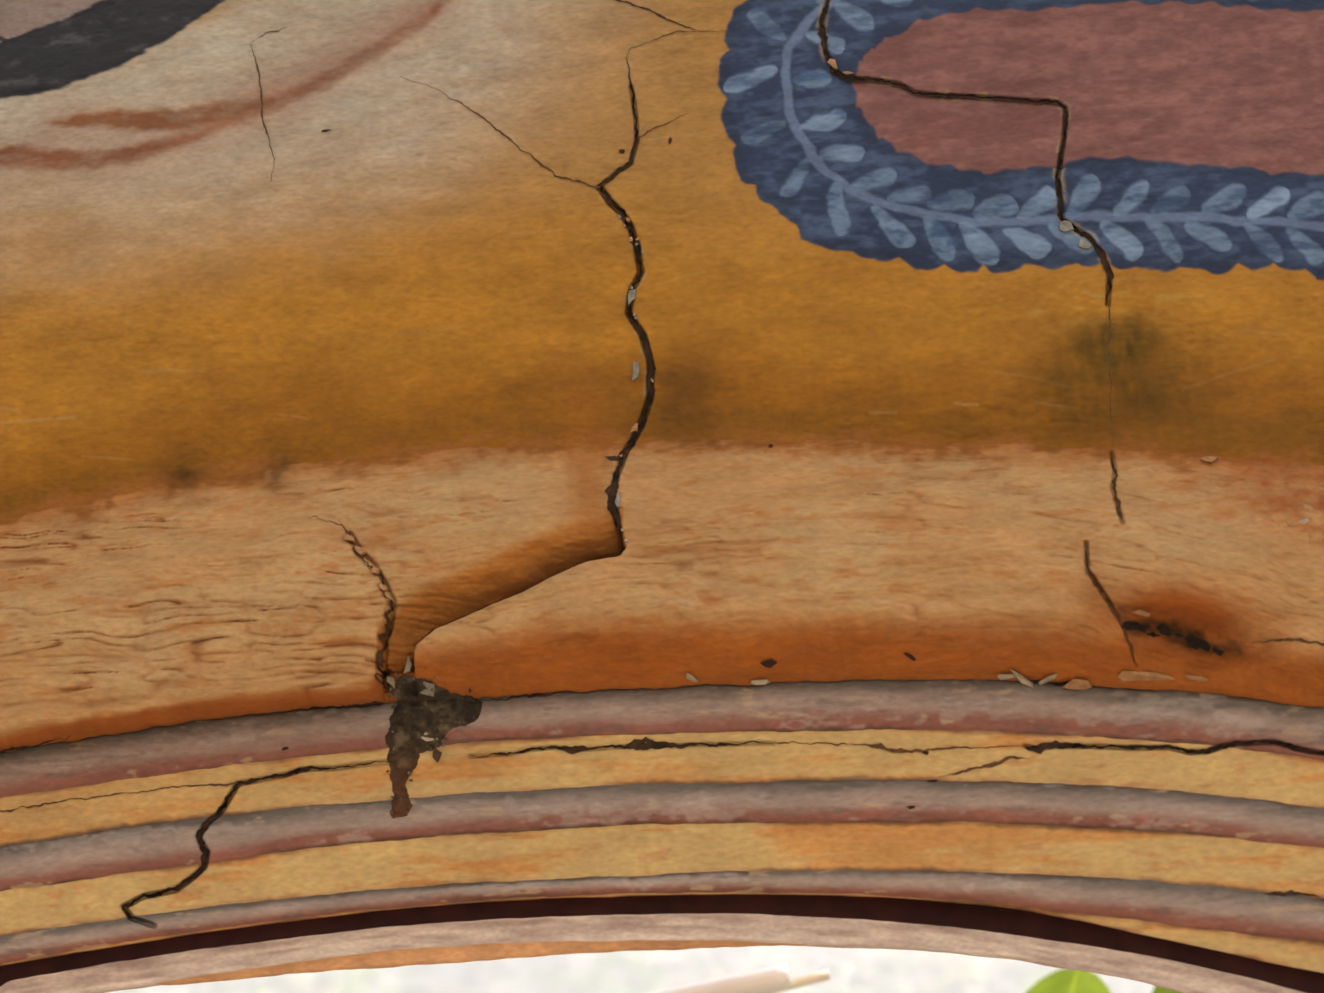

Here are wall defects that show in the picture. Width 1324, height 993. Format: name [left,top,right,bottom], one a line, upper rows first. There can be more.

crack [818,0,1124,523]
crack [285,0,717,712]
crack [1085,542,1138,667]
spalling [385,656,483,819]
crack [471,737,1324,777]
crack [0,761,388,925]